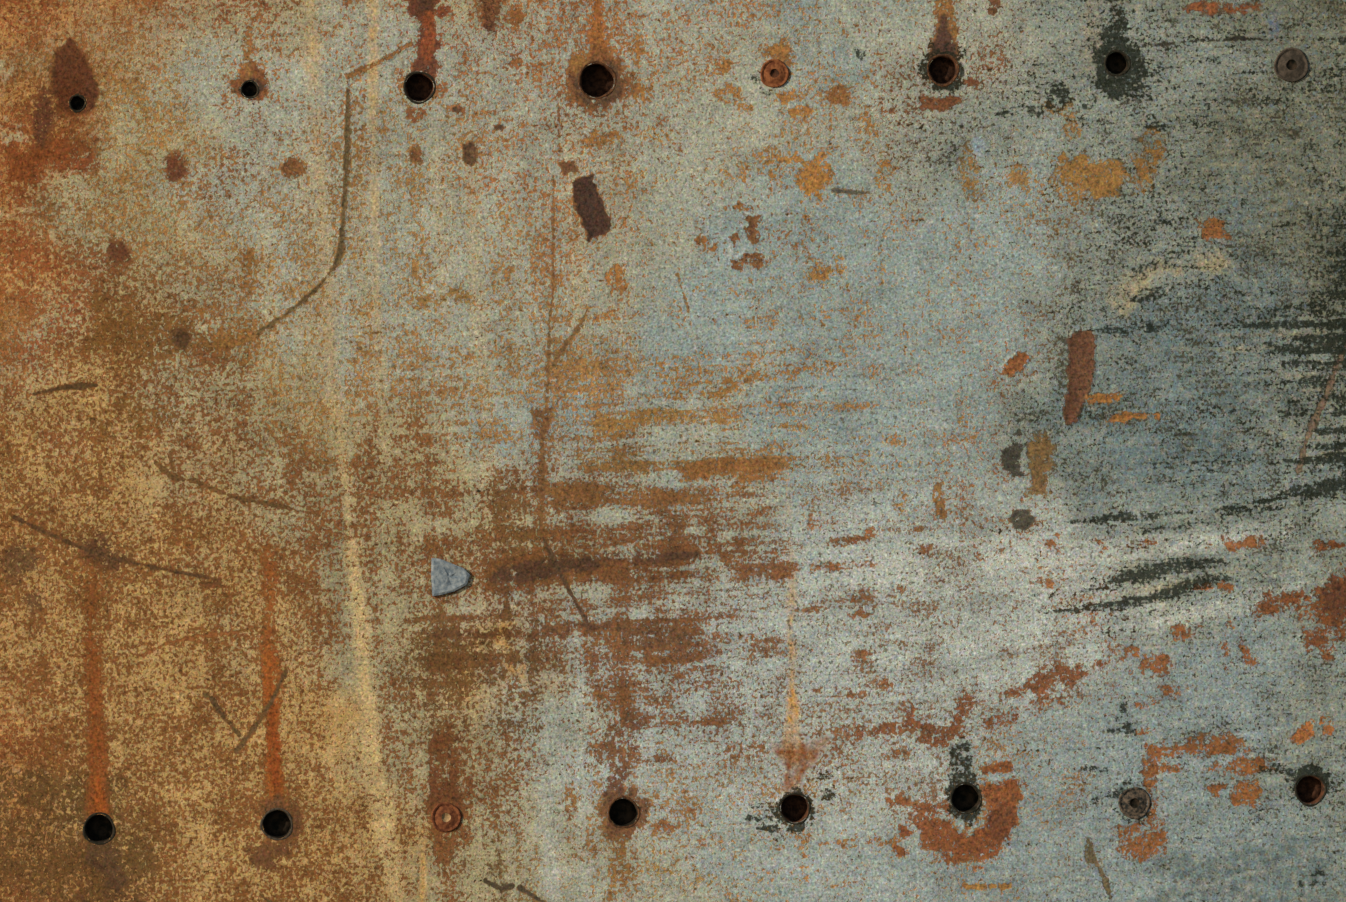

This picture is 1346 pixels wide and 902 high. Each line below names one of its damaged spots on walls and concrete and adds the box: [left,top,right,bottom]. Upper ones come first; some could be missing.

rust [0,36,109,233]
rust [228,18,273,105]
rust [392,0,469,126]
rust [492,0,693,196]
rust [690,143,838,273]
rust [708,35,904,196]
rust [905,0,981,114]
rust [952,125,1173,213]
rust [74,241,274,380]
rust [361,339,1346,902]
rust [0,521,185,902]
rust [240,531,308,879]